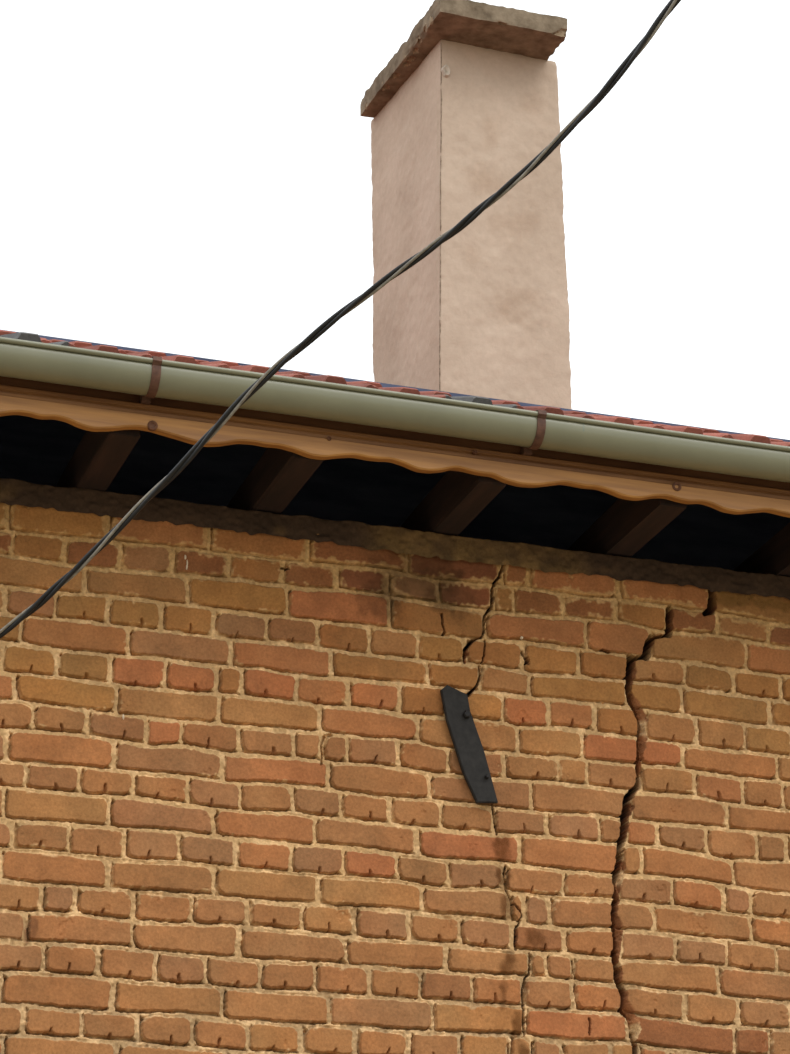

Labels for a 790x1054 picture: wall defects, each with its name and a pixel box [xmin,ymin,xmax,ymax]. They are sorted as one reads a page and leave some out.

crack [440,565,503,697]
crack [702,590,717,616]
crack [490,804,498,836]
crack [609,605,674,1054]
crack [502,865,533,1054]